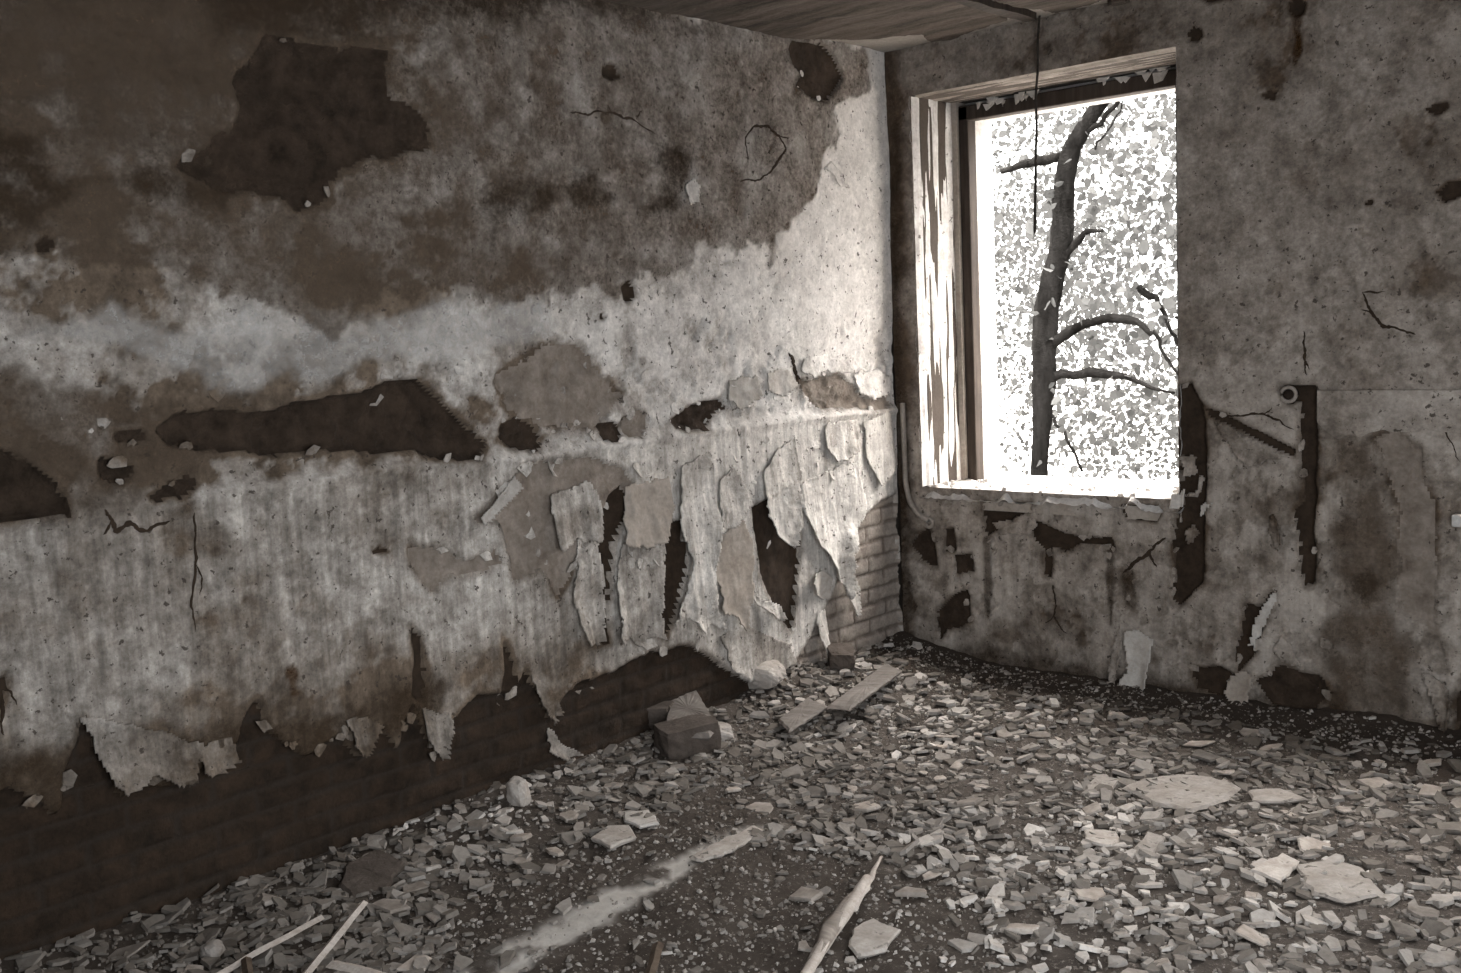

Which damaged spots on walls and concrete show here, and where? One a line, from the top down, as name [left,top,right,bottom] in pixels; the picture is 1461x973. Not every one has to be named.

water stain [0,0,869,337]
flaking render [0,343,1332,960]